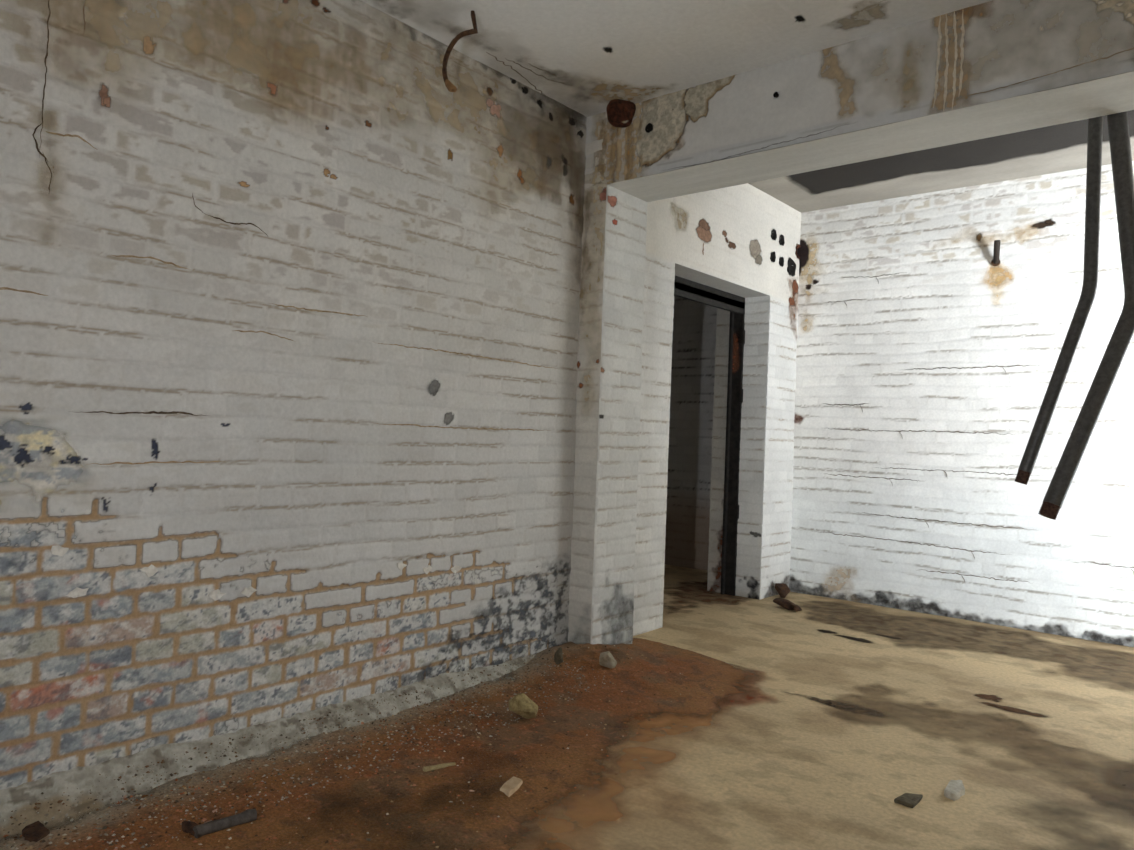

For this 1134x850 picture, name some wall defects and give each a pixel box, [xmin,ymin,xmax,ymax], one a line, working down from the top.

water stain [838,4,885,29]
crack [32,0,52,193]
water stain [414,52,660,190]
spalling [606,75,735,167]
water stain [821,46,855,115]
water stain [932,3,996,111]
peeling [269,303,367,317]
corrosion [990,267,1012,285]
peeling [429,380,440,396]
peeling [372,341,557,369]
peeling [0,402,571,790]